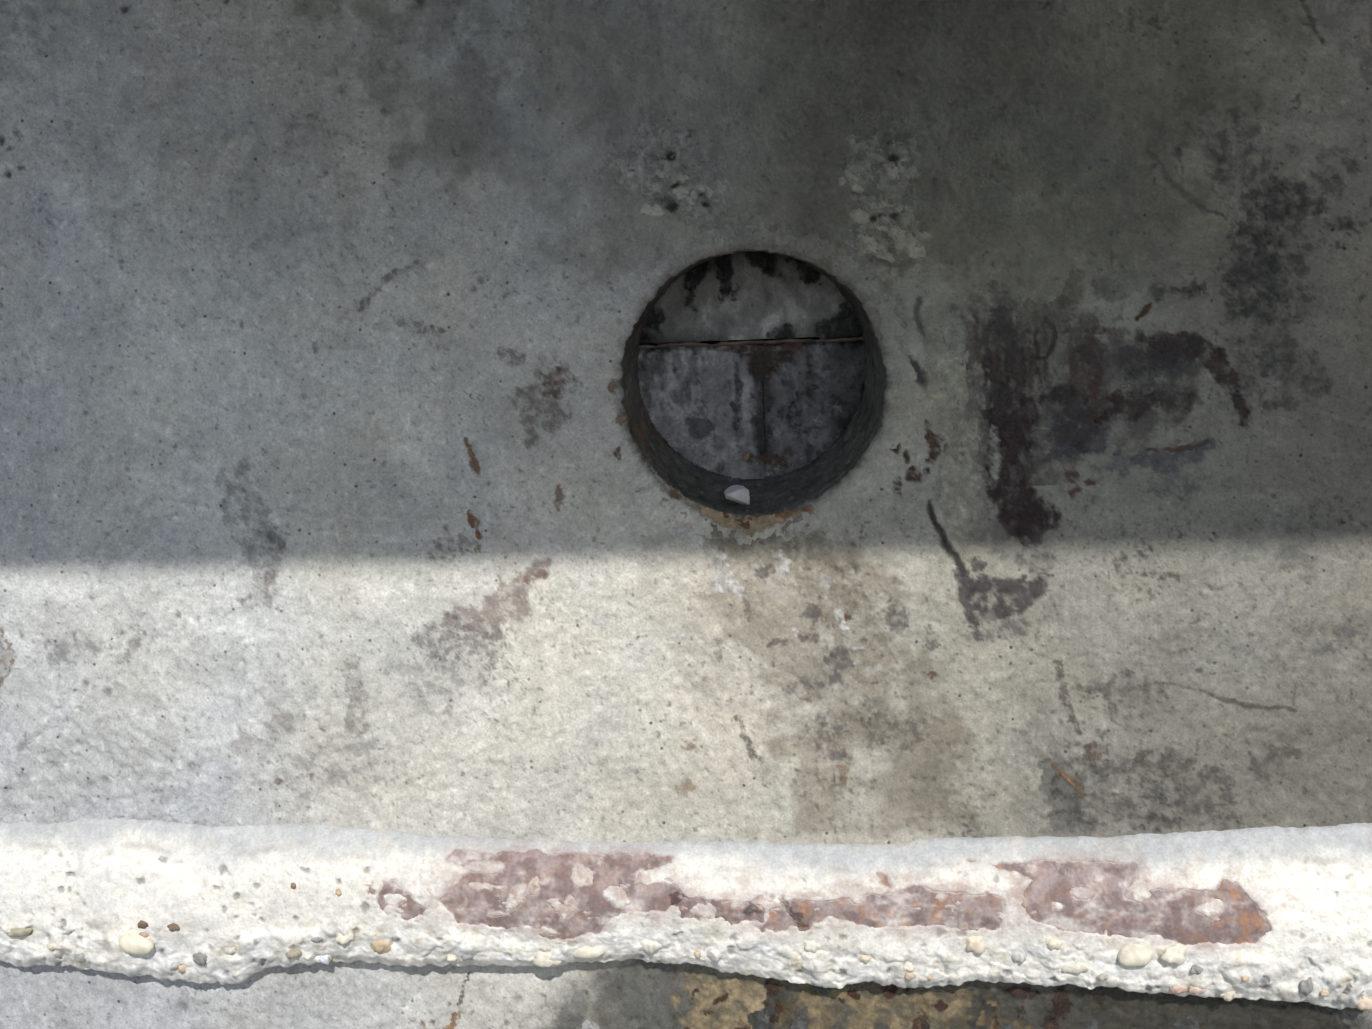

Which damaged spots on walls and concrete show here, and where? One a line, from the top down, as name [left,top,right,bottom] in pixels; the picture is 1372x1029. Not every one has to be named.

corrosion [661,342,825,468]
damp [564,961,723,1029]
corrosion [671,964,1073,1029]
damp [929,983,1347,1029]